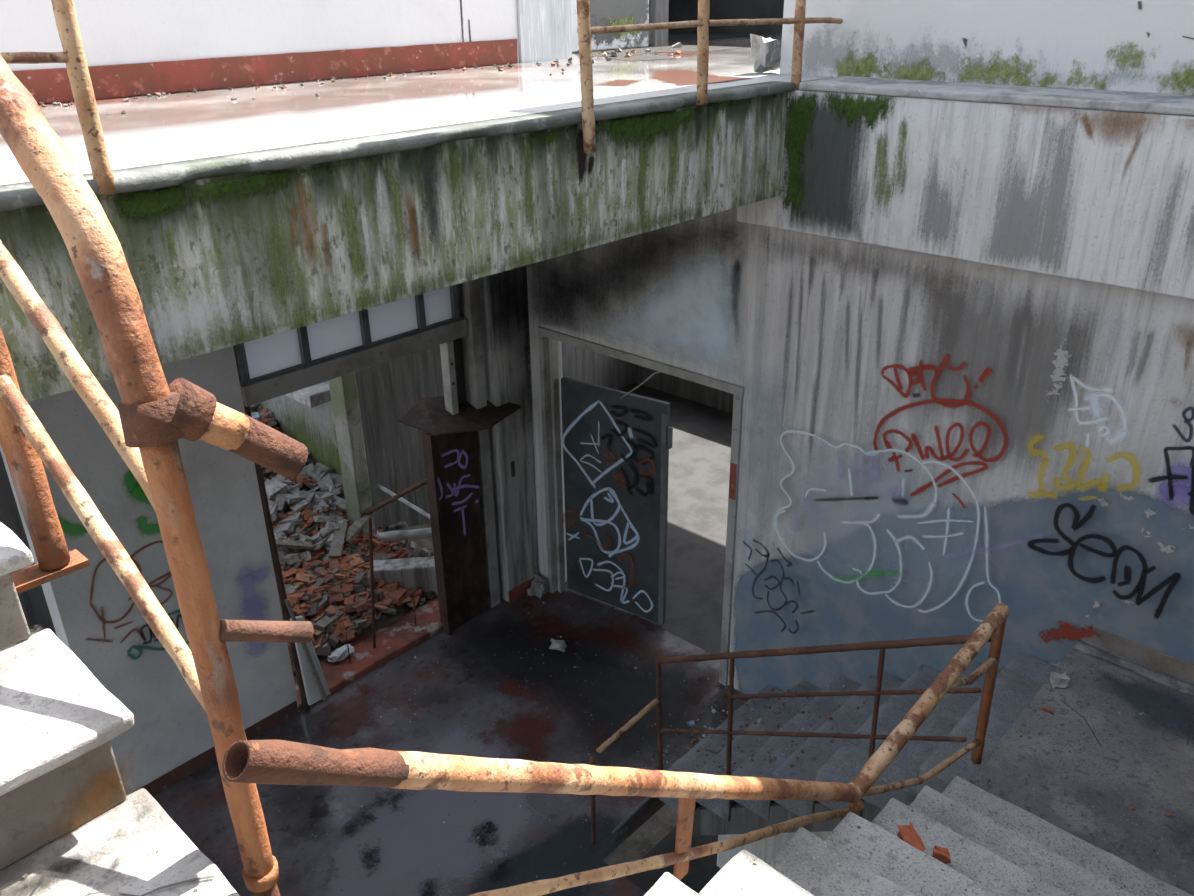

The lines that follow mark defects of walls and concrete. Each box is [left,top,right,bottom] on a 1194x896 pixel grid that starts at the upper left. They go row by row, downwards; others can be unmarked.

damp [804,32,989,81]
damp [412,147,438,253]
damp [784,99,865,233]
damp [922,166,957,241]
damp [989,123,1074,268]
damp [1143,179,1179,287]
damp [152,290,246,345]
crack [84,876,214,896]
damp [479,815,626,896]